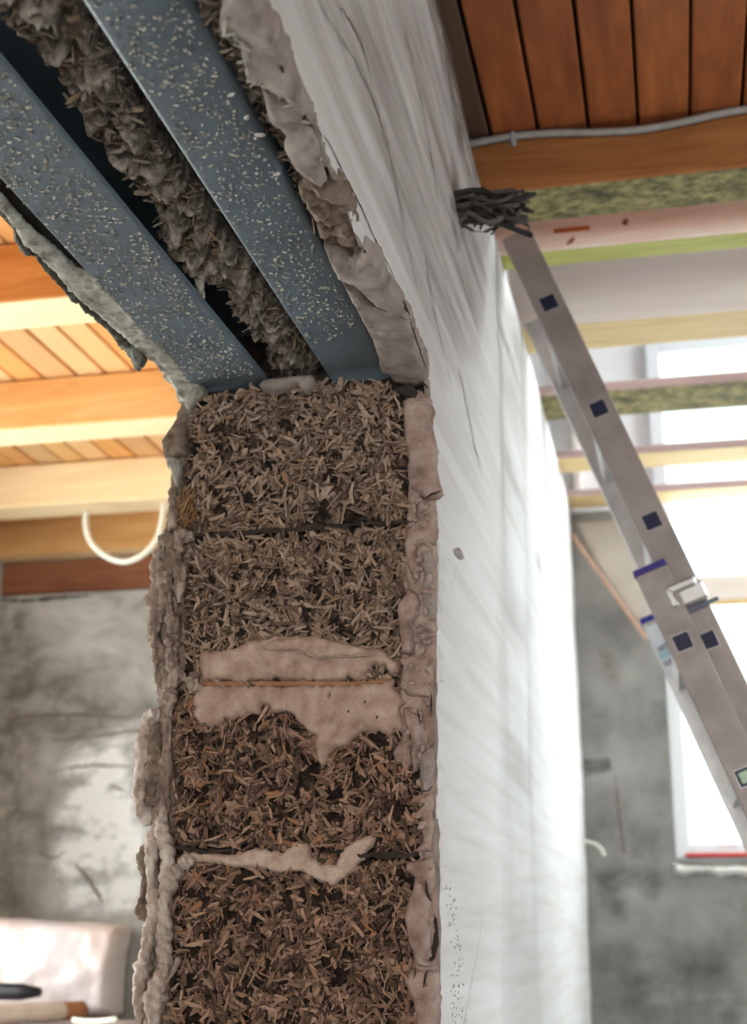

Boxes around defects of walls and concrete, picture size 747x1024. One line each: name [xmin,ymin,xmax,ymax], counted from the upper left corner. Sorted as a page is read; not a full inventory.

flaking render [220,0,405,317]